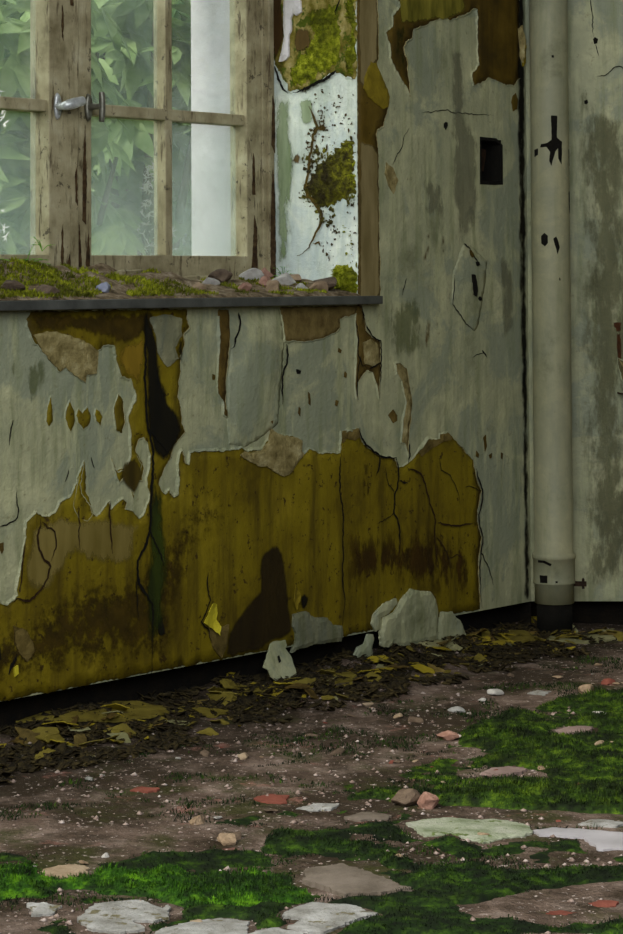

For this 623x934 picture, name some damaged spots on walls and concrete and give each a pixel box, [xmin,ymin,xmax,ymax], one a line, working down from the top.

peeling [61,127,90,267]
damp [276,89,355,259]
peeling [274,0,522,402]
crack [356,307,382,396]
crack [0,493,81,607]
crack [107,503,115,554]
flaking render [0,308,503,701]
crack [338,455,346,625]
crack [359,427,493,602]